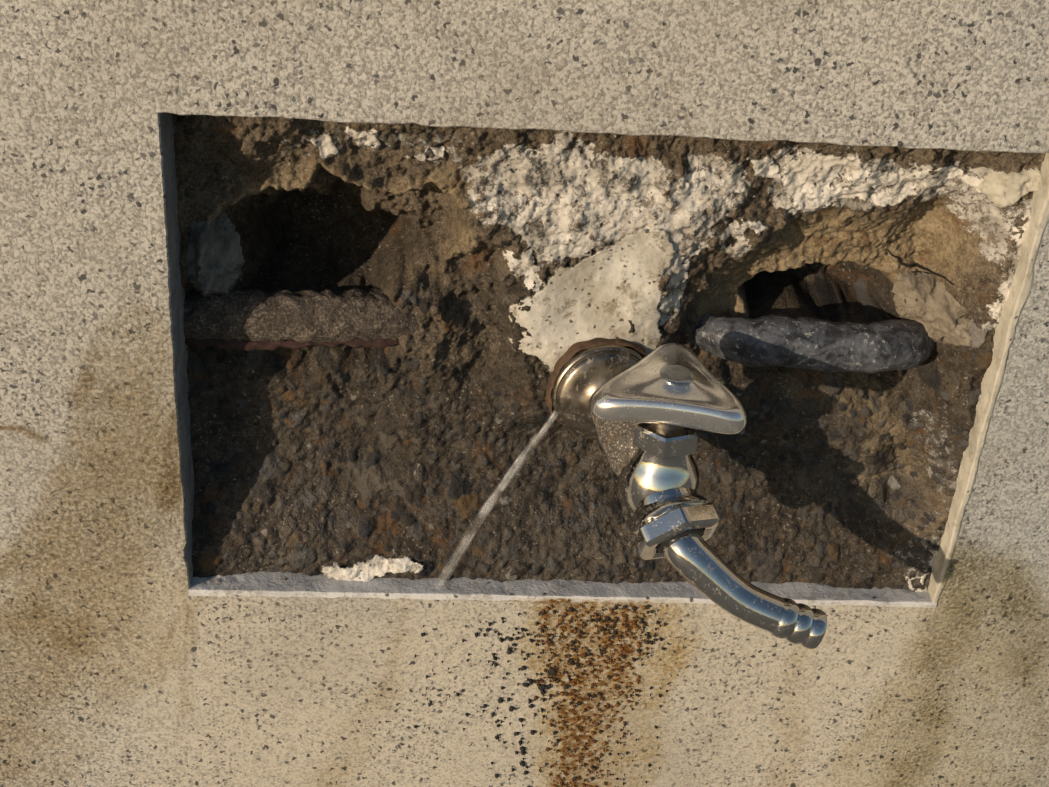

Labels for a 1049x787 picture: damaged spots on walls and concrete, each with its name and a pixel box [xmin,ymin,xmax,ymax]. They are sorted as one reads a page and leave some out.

spalling [223,133,465,293]
flaking render [345,126,381,149]
spalling [488,138,1031,375]
flaking render [905,550,939,592]
corrosion [533,605,648,787]